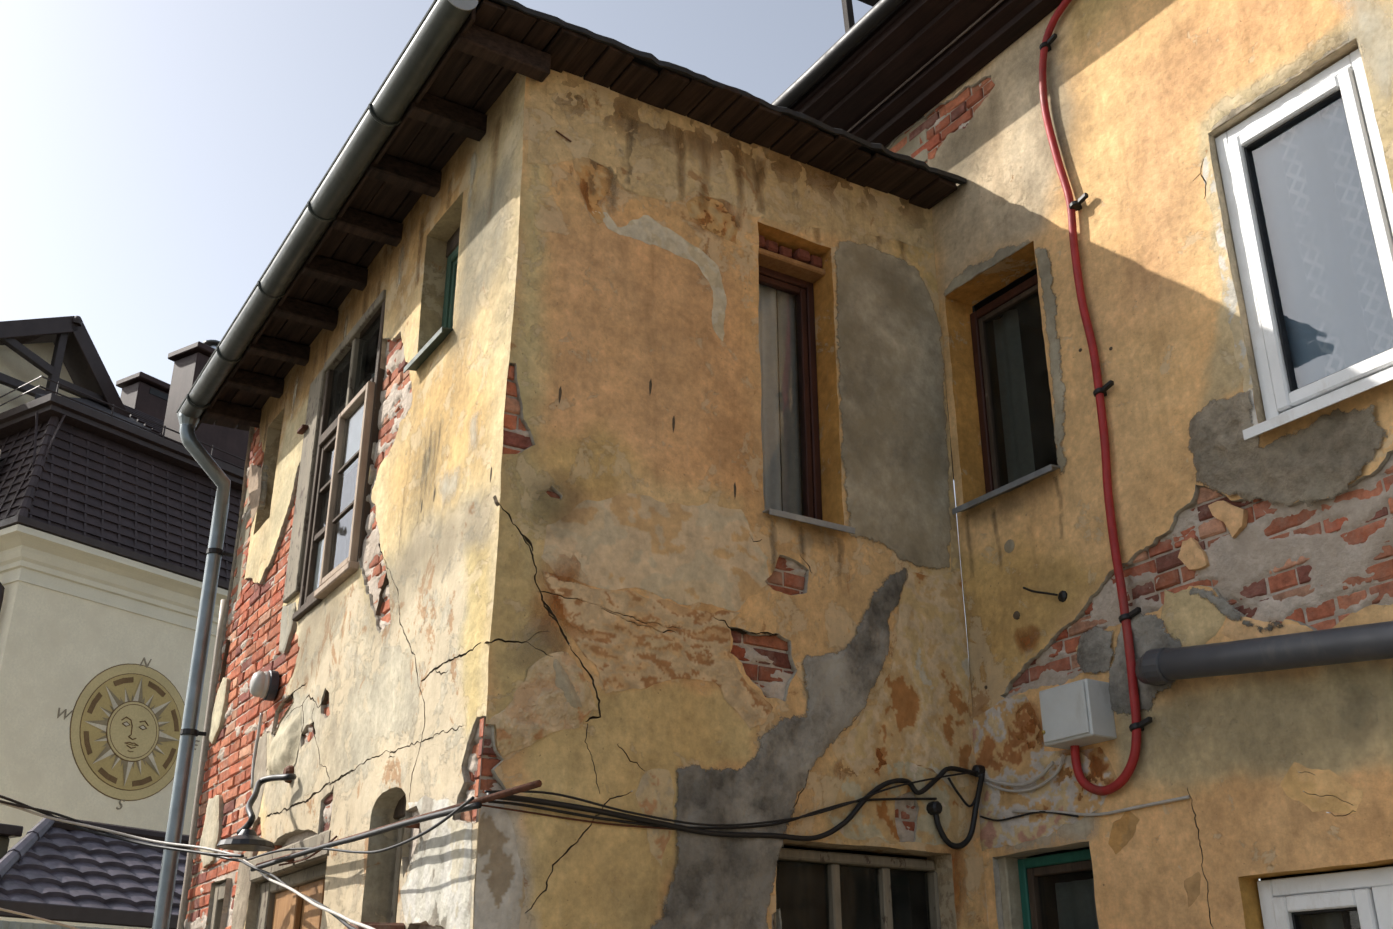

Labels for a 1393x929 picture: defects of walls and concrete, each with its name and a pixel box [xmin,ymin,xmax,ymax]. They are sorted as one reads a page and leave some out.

peeling [527,69,935,341]
spalling [887,75,995,165]
spalling [180,425,334,929]
spalling [358,331,413,633]
peeling [400,716,525,929]
crack [266,495,677,913]
spalling [490,363,535,481]
peeling [541,483,809,728]
crack [715,618,778,636]
spalling [827,450,1393,854]